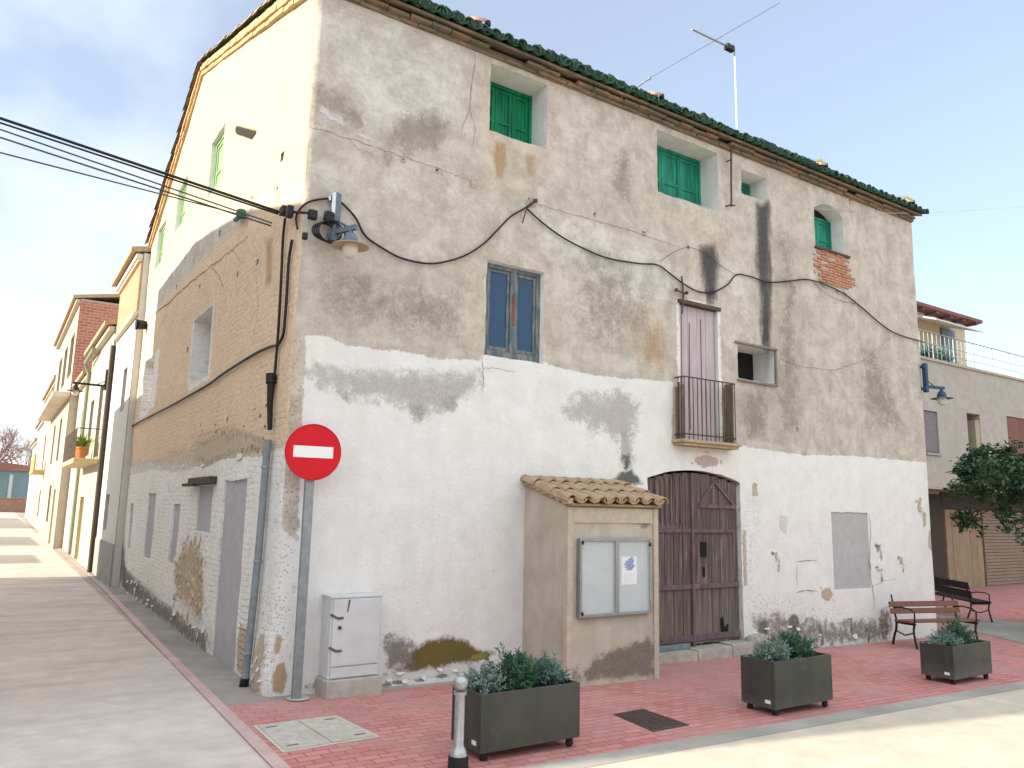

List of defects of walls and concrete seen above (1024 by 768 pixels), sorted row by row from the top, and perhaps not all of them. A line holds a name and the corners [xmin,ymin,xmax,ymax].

spalling [813,250,857,294]
peeling [564,389,640,466]
spalling [691,450,723,468]
spalling [122,533,208,651]
damp [880,607,892,634]
spalling [273,636,286,693]
mould [384,635,418,672]